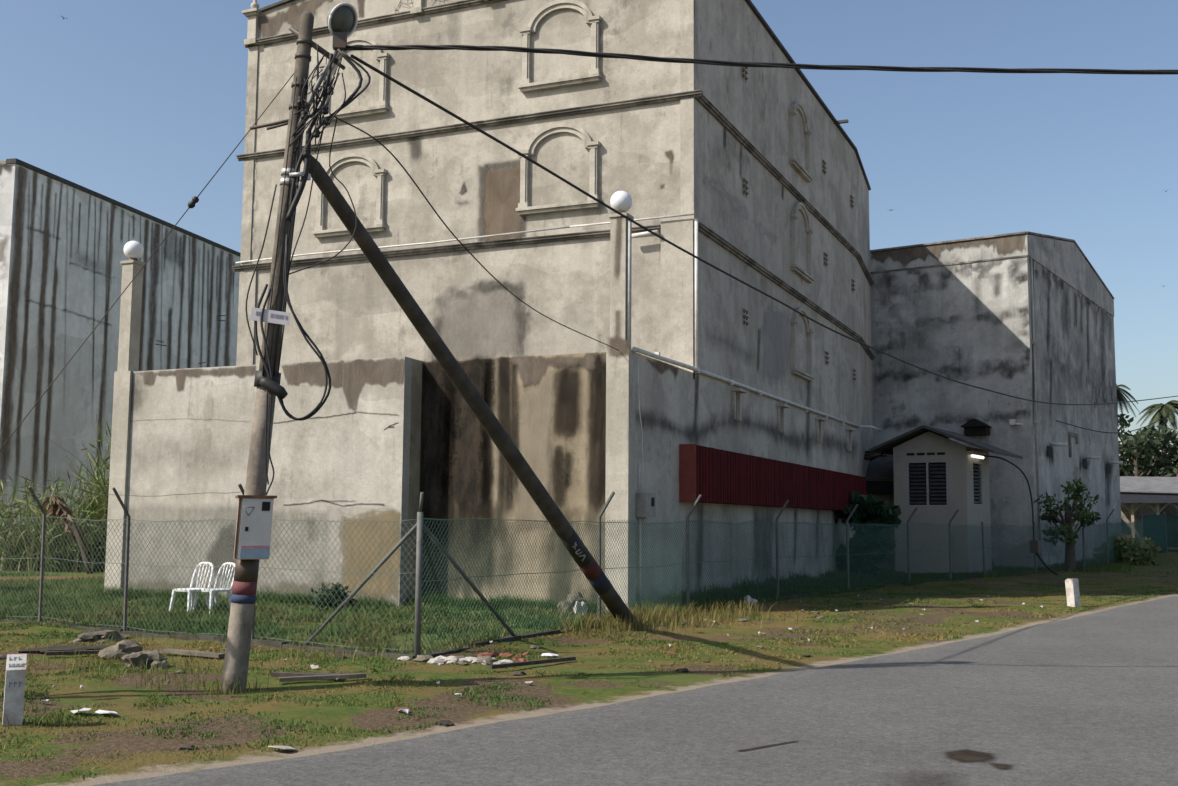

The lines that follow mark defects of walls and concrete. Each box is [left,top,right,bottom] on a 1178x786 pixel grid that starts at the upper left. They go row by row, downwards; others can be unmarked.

damp [131,366,255,406]
damp [283,358,405,410]
damp [419,360,518,599]
damp [457,311,629,521]
damp [871,234,1105,382]
damp [986,337,1034,419]